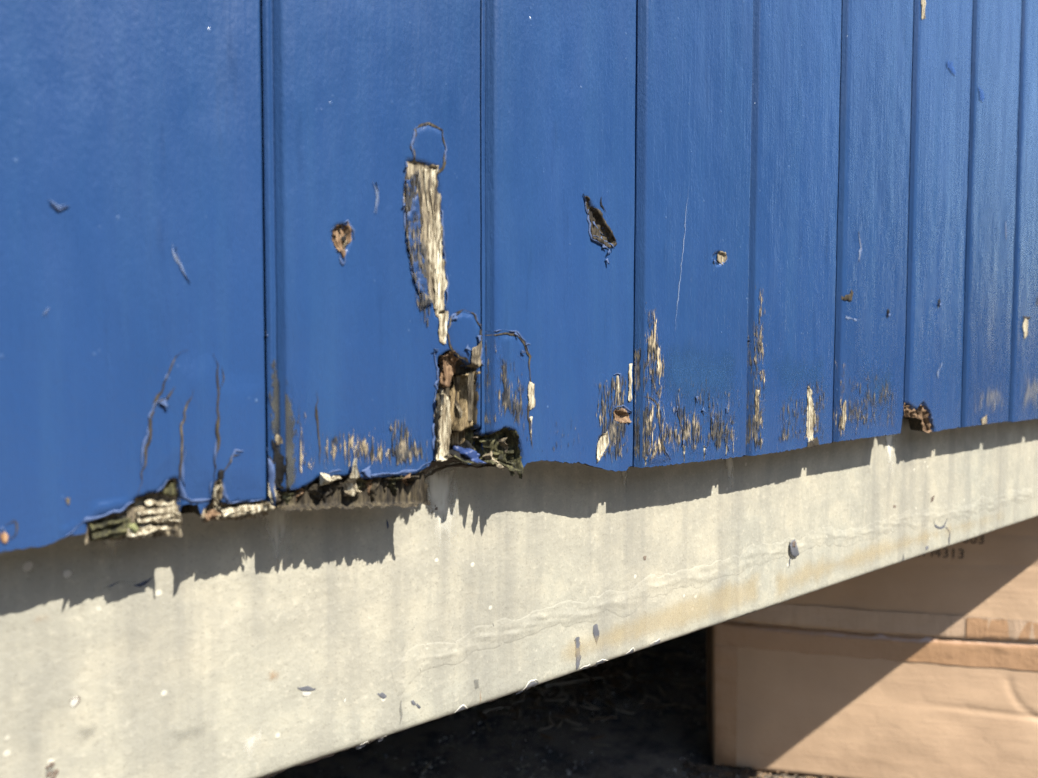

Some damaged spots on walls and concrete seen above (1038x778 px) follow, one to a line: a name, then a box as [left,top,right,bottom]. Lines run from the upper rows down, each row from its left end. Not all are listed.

spalling [583,194,617,264]
peeling [402,122,484,462]
peeling [596,287,766,466]
peeling [780,366,934,448]
peeling [266,447,276,506]